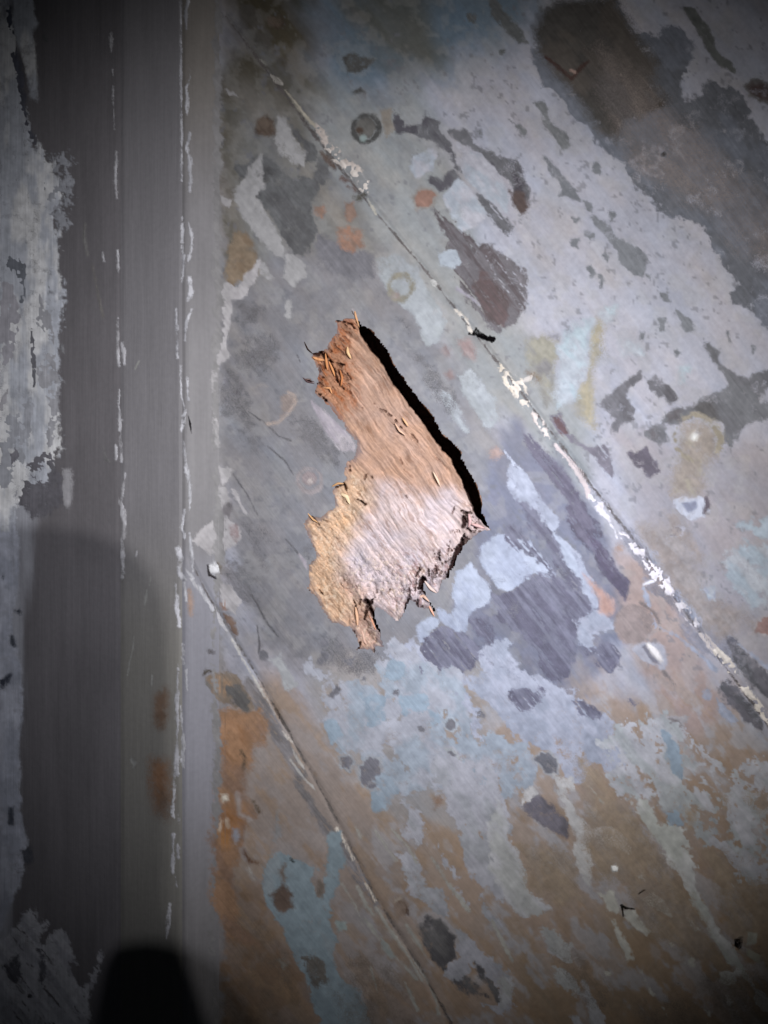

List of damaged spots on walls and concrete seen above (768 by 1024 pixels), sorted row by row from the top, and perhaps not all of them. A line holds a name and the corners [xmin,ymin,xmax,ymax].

peeling [0,0,126,1024]
spalling [102,389,138,580]
spalling [170,643,188,886]
spalling [174,0,768,1024]
crack [225,15,768,726]